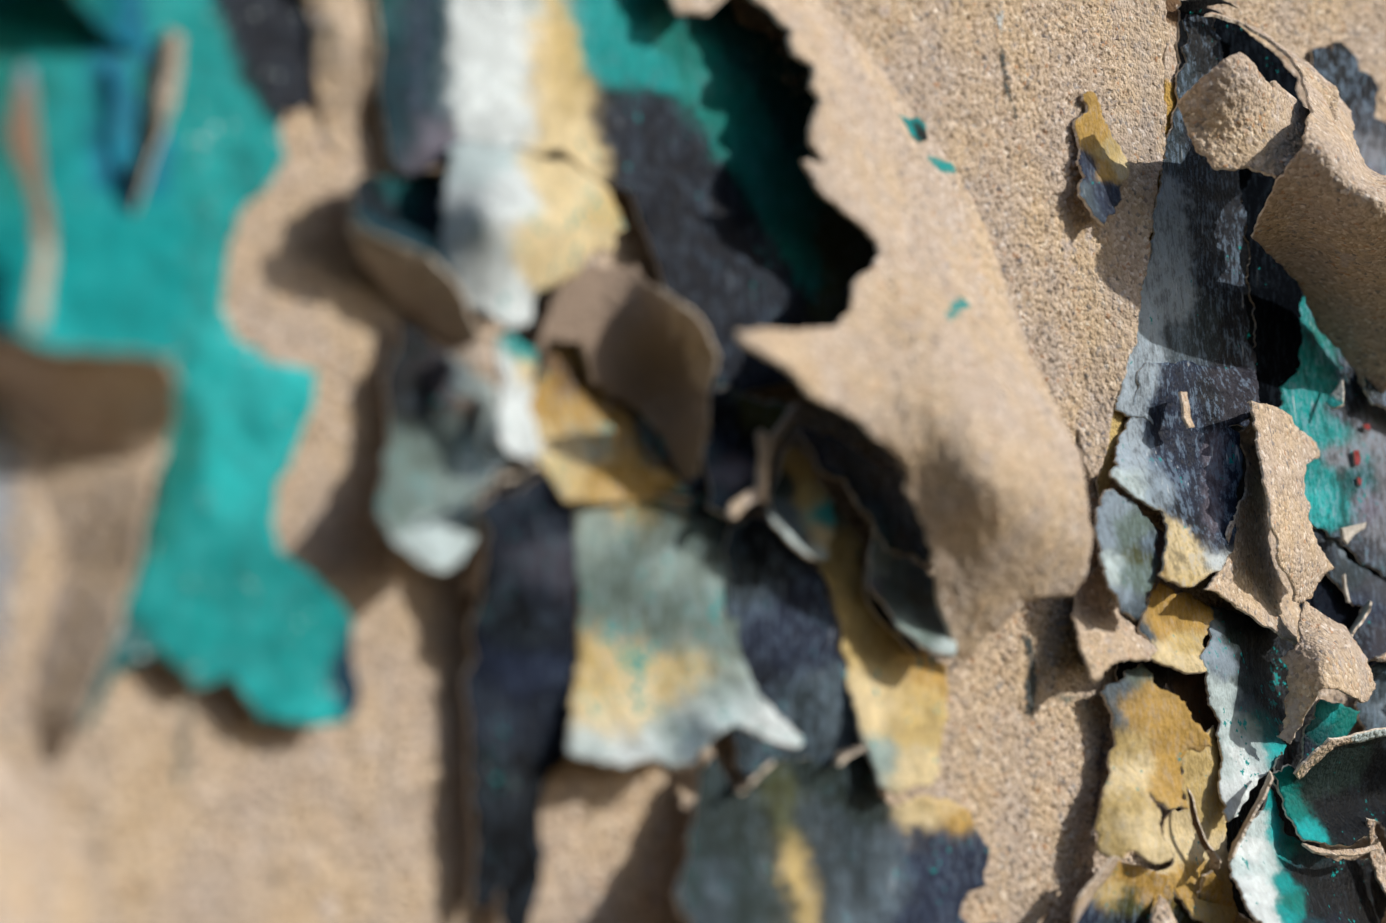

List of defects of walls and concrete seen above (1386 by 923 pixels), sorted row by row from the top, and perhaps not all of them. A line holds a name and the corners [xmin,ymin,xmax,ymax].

peeling [0,0,990,923]
peeling [734,0,1386,923]